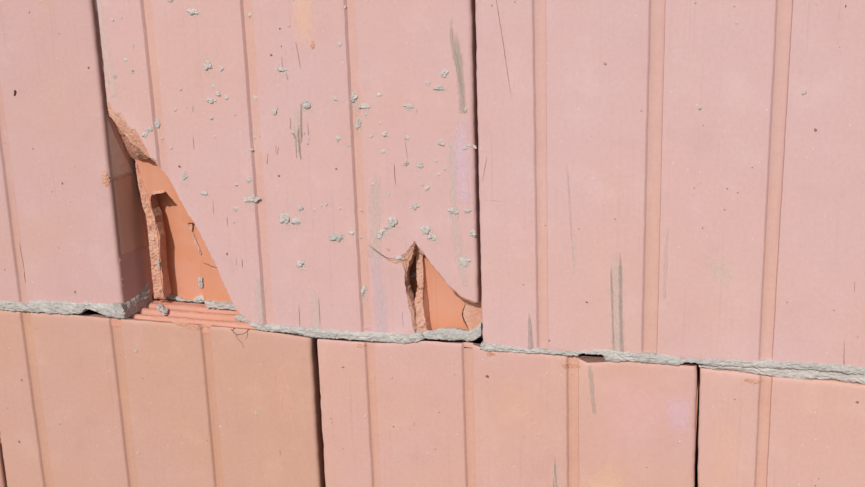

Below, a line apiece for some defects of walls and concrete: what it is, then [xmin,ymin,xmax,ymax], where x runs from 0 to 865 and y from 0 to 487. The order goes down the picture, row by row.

spalling [112,119,241,315]
spalling [386,246,483,338]